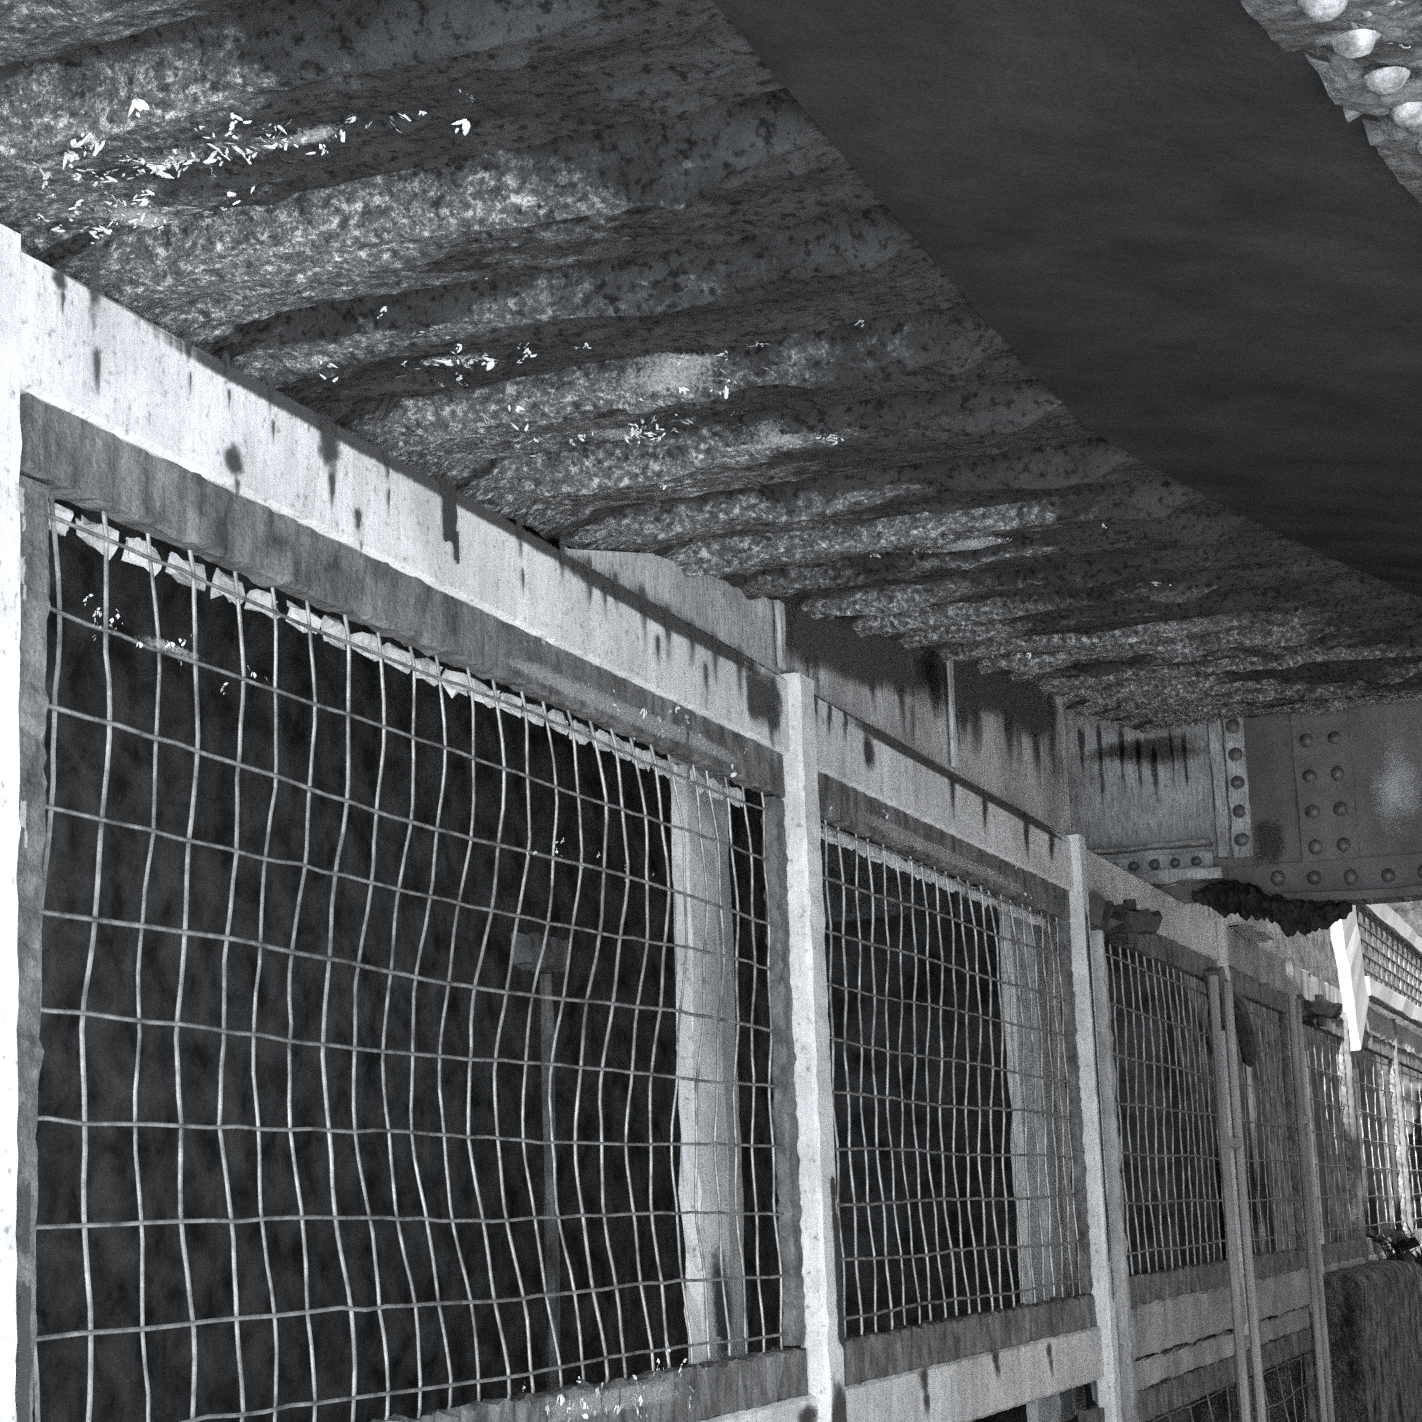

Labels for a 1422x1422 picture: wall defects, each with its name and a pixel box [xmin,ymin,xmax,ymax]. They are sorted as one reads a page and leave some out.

leakage [155,327,709,636]